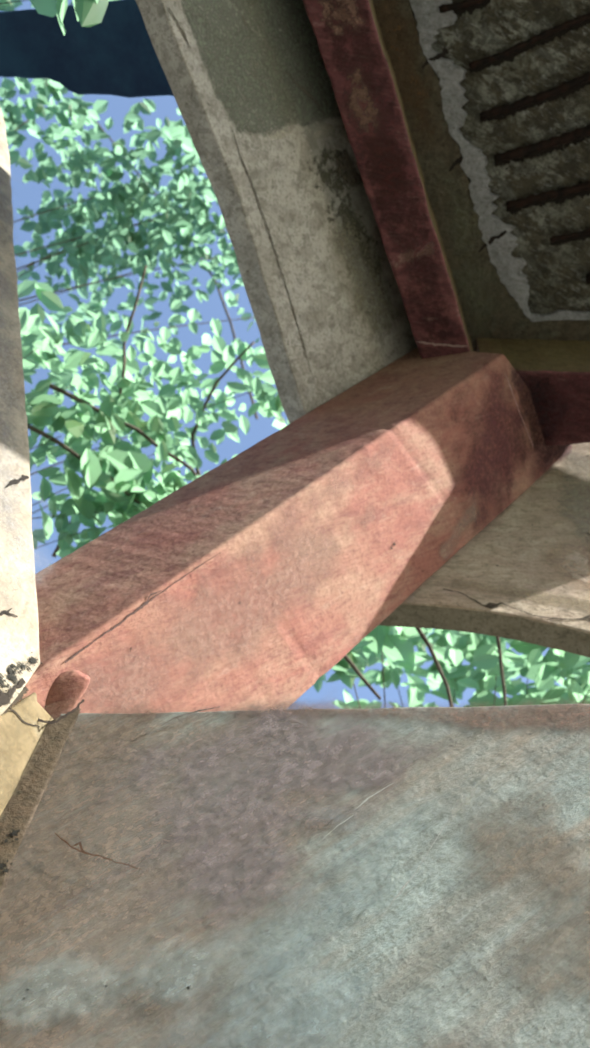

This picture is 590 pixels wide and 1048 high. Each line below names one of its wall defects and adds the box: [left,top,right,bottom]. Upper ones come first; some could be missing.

spalling [410,0,590,322]
crack [443,588,590,620]
crack [0,678,84,727]